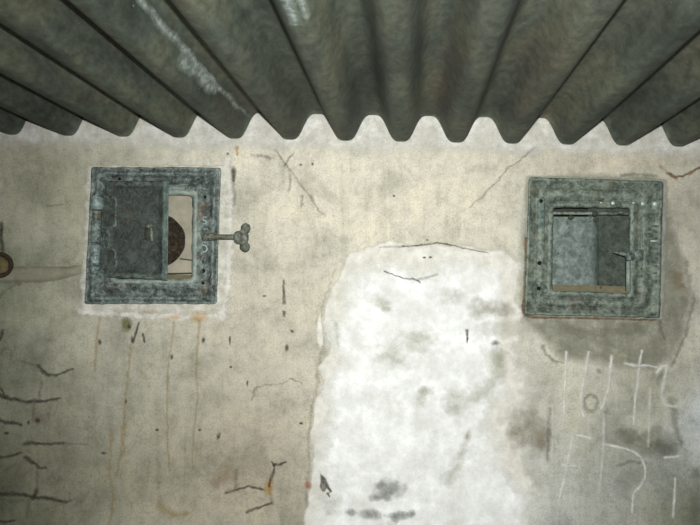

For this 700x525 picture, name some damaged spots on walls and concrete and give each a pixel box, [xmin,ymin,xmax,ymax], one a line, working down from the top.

leakage [538,219,687,364]
crack [0,389,59,403]
flaking render [304,240,540,525]
crack [1,442,64,469]
crack [0,490,67,503]
crack [227,462,286,513]